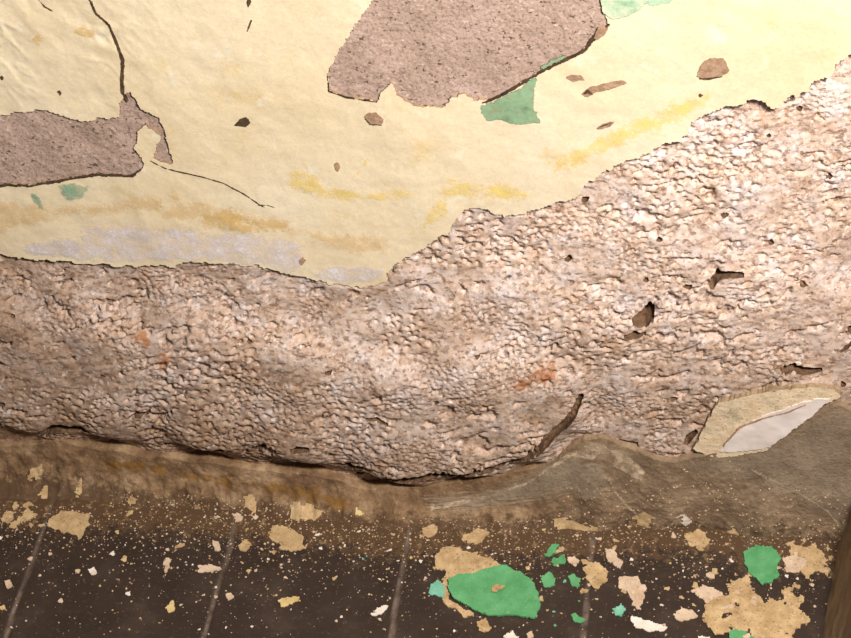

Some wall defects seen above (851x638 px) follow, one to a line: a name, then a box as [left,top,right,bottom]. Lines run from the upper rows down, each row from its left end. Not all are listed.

crack [89,0,129,102]
peeling [327,0,610,126]
peeling [0,92,173,188]
crack [151,161,275,208]
spalling [235,117,250,127]
spalling [431,54,851,457]
peeling [632,512,656,528]
peeling [676,515,711,551]